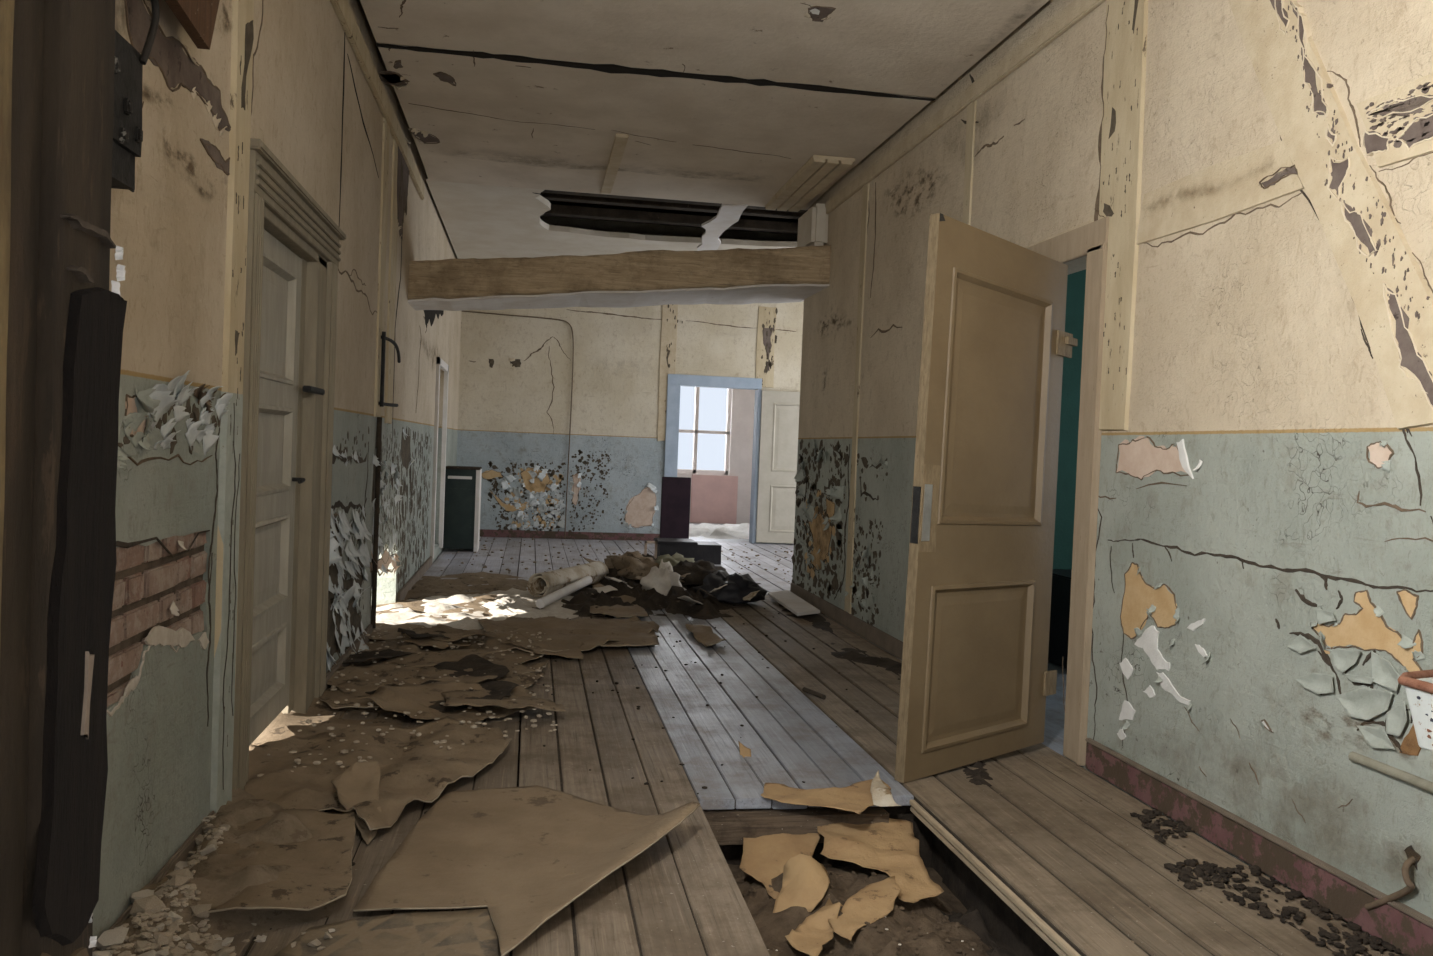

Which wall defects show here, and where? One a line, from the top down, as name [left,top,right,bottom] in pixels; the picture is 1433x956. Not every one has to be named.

peeling [124,0,254,176]
peeling [1270,0,1433,410]
crack [1327,71,1433,293]
crack [1351,297,1373,359]
spalling [107,531,209,717]
crack [116,403,240,790]
peeling [326,427,430,671]
peeling [1120,562,1210,713]
crack [1062,482,1433,753]
peeling [1310,589,1425,672]
crack [1357,429,1433,542]
crack [1184,707,1259,785]